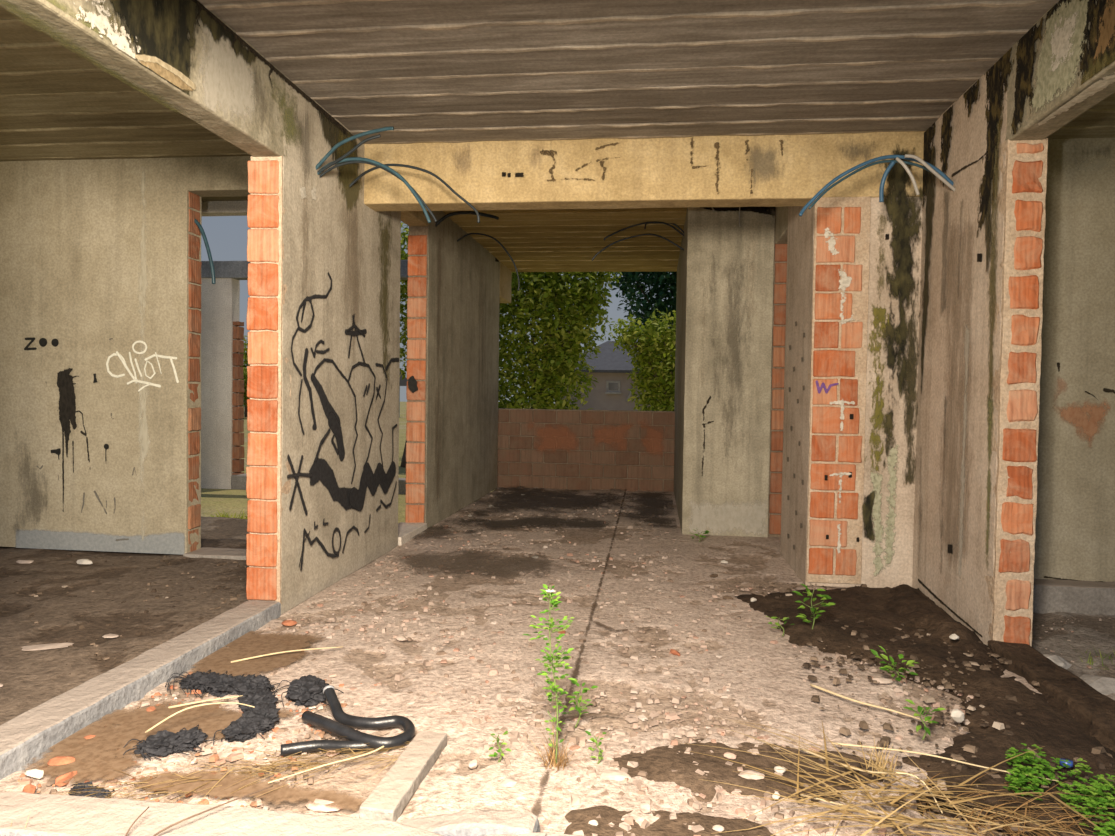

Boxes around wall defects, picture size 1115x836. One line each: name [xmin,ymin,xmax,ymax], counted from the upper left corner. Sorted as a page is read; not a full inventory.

damp [100,0,257,115]
damp [273,89,302,142]
peeling [1038,72,1115,126]
damp [883,0,1115,484]
flaking render [998,143,1044,645]
flaking render [1060,402,1110,441]
damp [862,491,875,541]